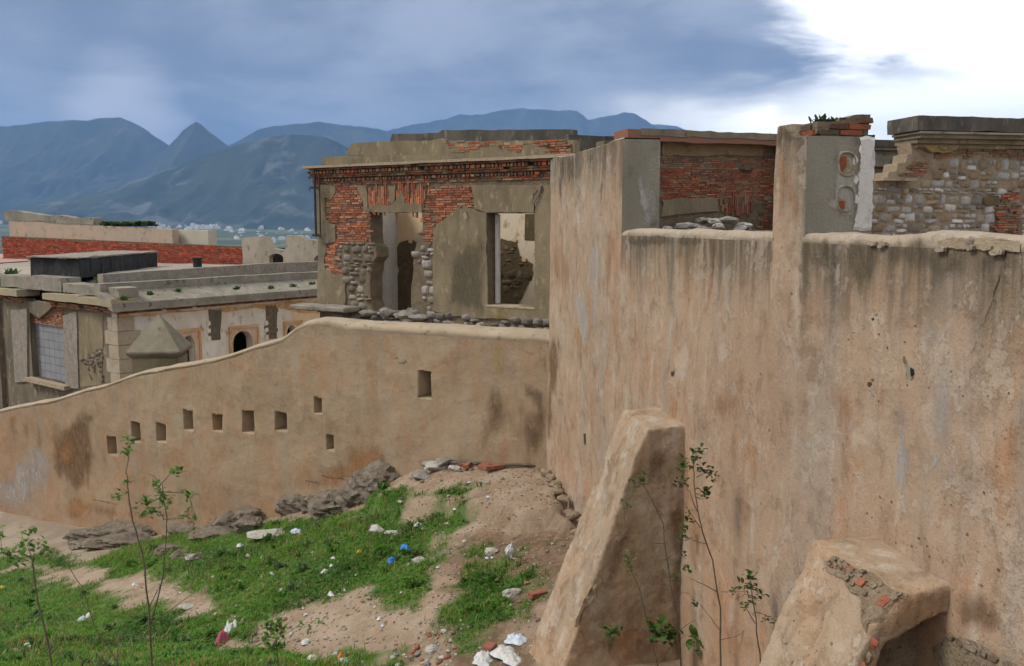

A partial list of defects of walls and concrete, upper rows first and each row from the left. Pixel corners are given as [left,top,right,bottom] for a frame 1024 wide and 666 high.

peeling [444,139,554,153]
peeling [324,180,474,310]
leakage [629,235,665,245]
spalling [934,236,1020,256]
leakage [0,417,91,506]
spalling [824,556,917,666]